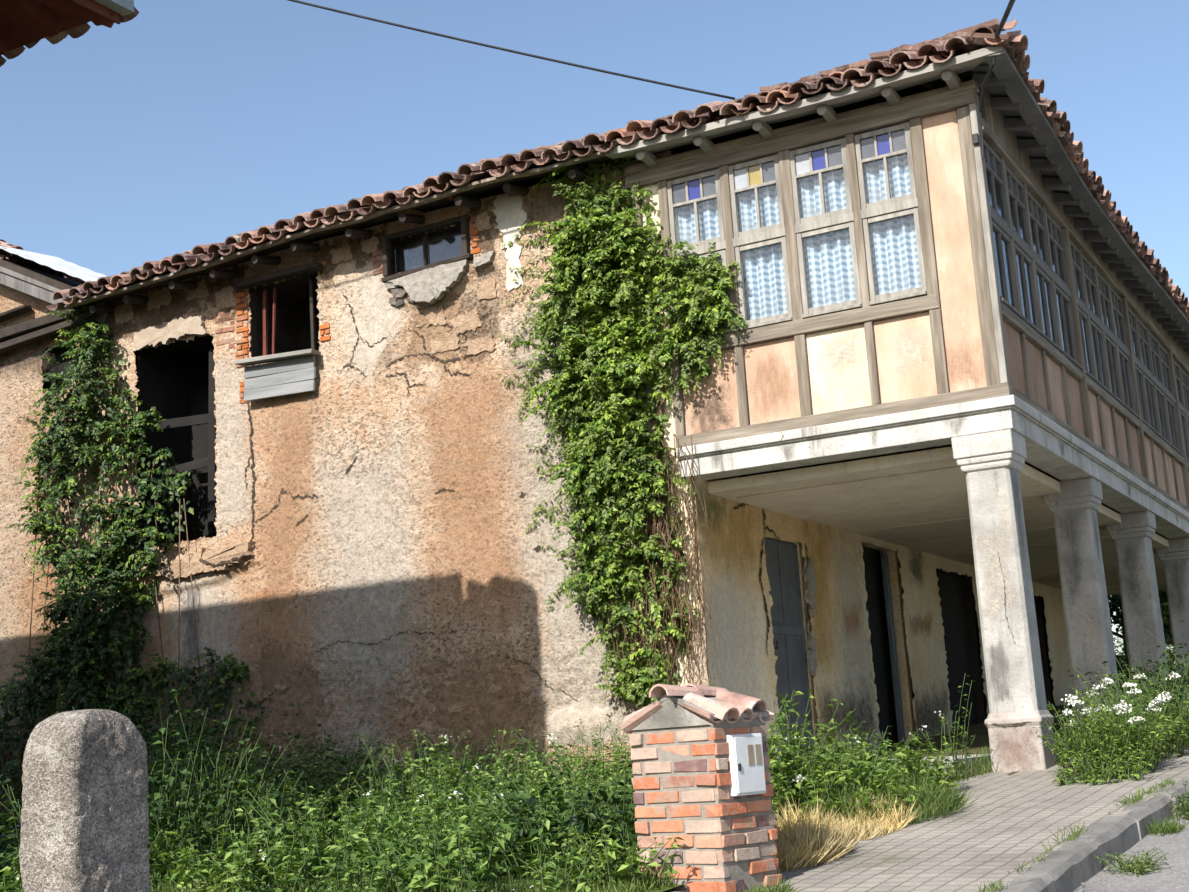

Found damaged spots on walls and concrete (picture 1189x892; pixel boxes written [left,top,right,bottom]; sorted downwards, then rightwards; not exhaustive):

spalling [312,196,498,377]
crack [340,295,497,395]
crack [199,402,323,567]
crack [312,626,475,676]
crack [733,503,776,655]
crack [806,602,814,632]
crack [998,553,1015,643]
water stain [824,695,873,742]
water stain [915,696,947,739]